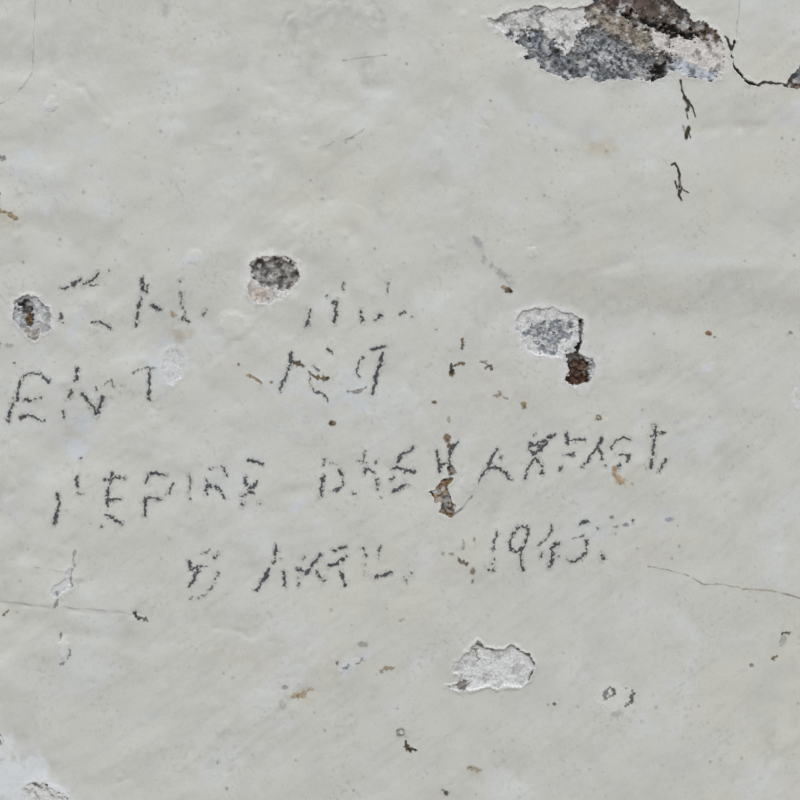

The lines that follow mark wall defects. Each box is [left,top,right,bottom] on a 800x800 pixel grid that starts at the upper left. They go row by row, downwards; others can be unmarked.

flaking render [478,0,733,92]
crack [724,36,785,92]
flaking render [778,60,800,96]
flaking render [235,245,310,316]
flaking render [2,288,60,351]
flaking render [501,285,606,397]
peeling [442,636,540,697]
peeling [0,712,18,765]
peeling [13,772,85,800]